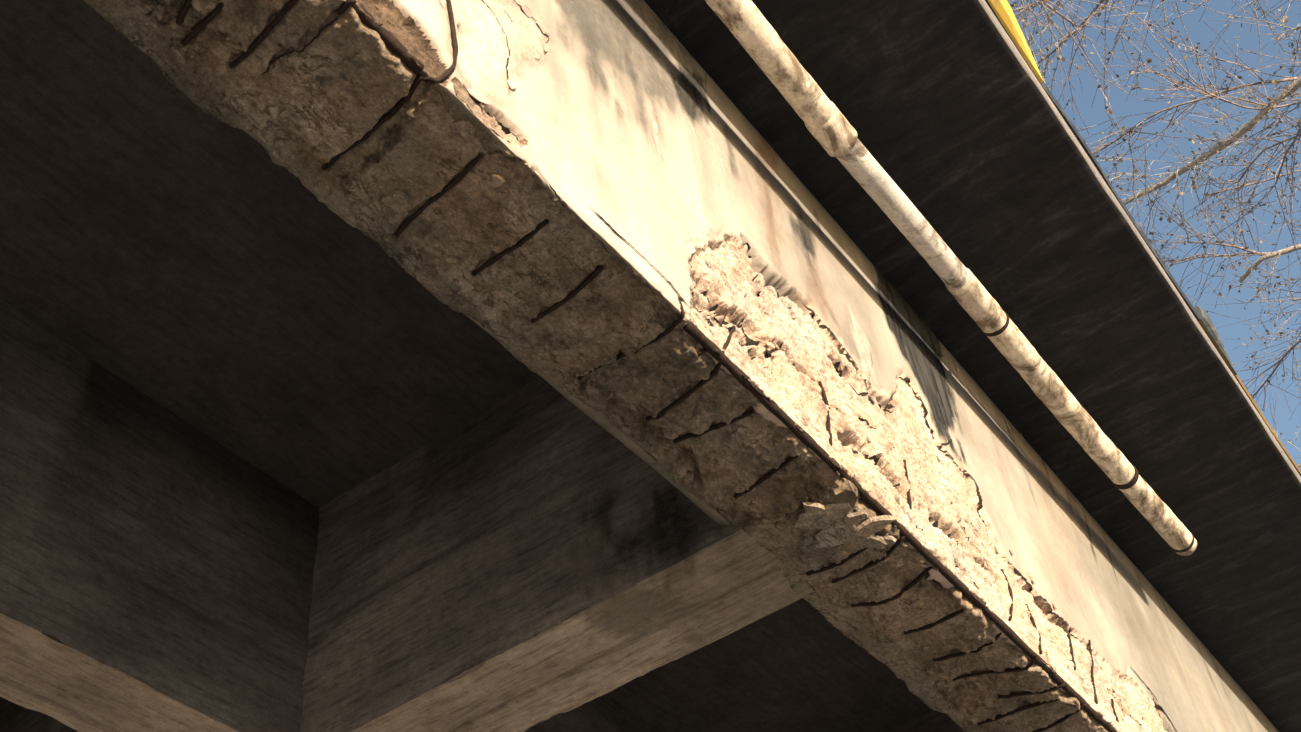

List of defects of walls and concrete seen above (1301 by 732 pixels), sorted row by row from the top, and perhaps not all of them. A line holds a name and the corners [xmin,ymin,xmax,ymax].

water stain [558,0,710,157]
spalling [132,0,1167,732]
water stain [939,360,966,461]